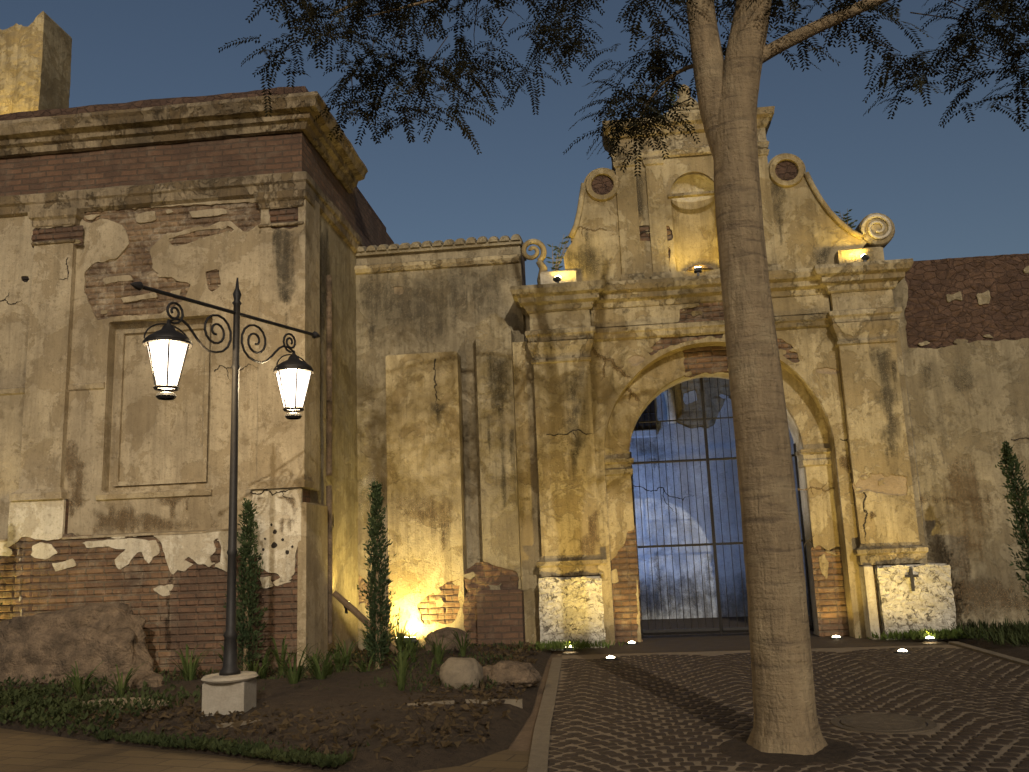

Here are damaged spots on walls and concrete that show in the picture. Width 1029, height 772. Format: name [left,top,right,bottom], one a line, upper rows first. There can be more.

flaking render [31,202,298,320]
leakage [273,230,292,300]
flaking render [677,302,724,323]
crack [432,359,440,405]
flaking render [645,334,729,378]
crack [861,492,869,541]
flaking render [0,523,298,675]
spalling [417,561,519,644]
flaking render [610,525,643,643]
flaking render [811,545,850,637]